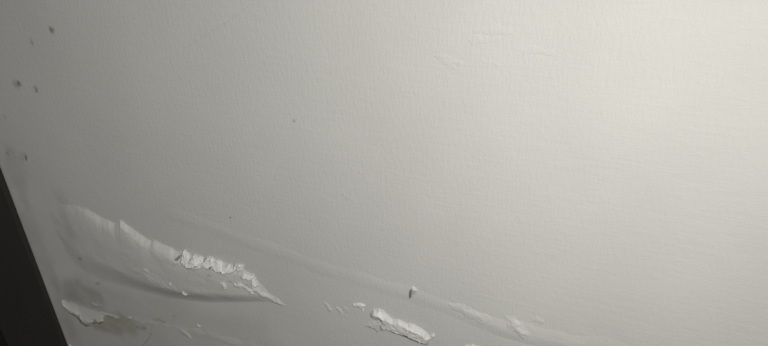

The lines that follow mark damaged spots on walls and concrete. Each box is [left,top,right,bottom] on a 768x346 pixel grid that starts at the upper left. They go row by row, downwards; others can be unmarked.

peeling [61,299,133,326]
peeling [351,303,435,344]